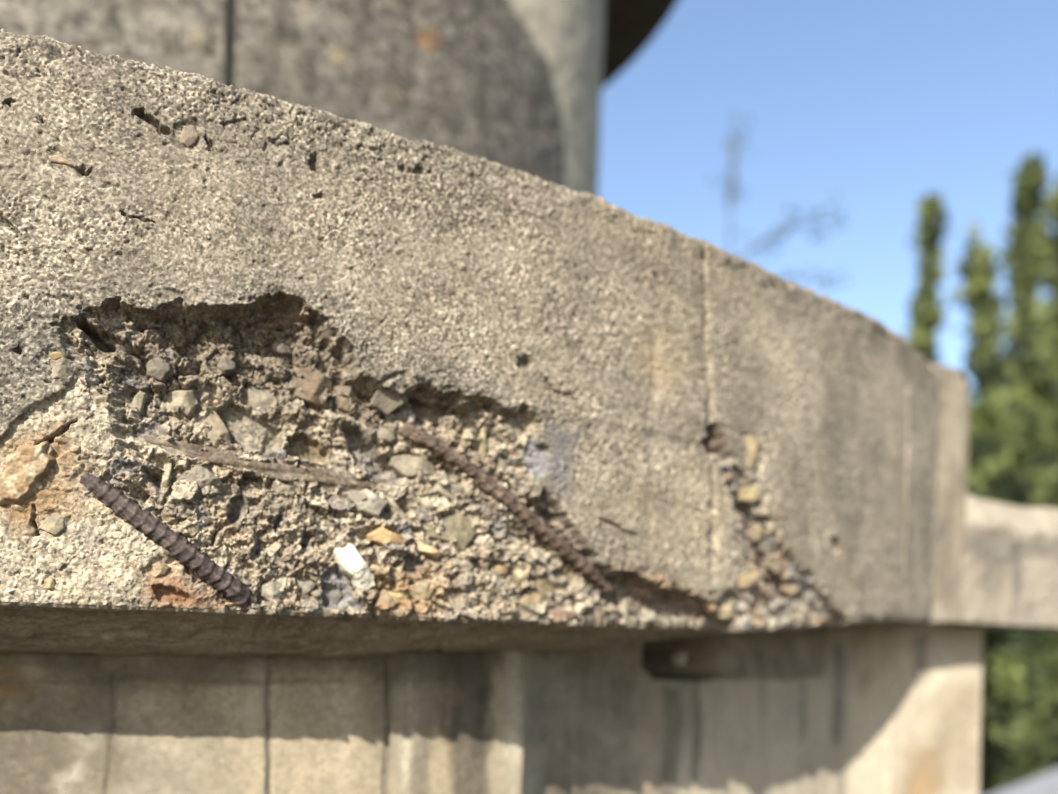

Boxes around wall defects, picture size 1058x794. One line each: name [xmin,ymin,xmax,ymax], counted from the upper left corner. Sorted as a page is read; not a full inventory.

rust [154,580,202,604]
spalling [0,292,830,683]
crack [685,240,849,629]